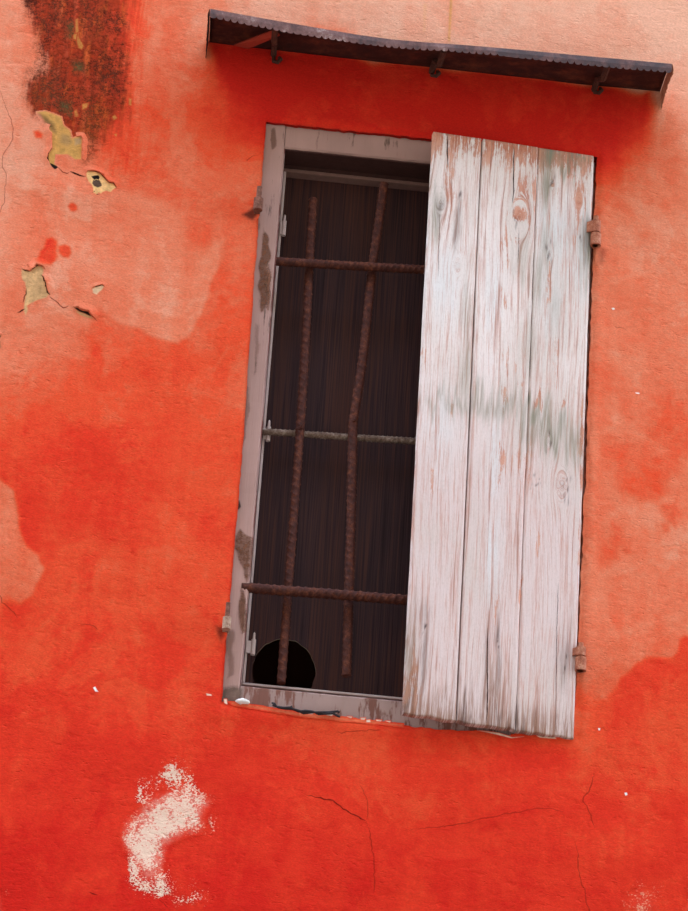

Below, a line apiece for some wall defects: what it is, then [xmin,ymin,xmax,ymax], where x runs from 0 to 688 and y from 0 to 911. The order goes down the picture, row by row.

spalling [36,104,121,195]
spalling [17,258,107,321]
crack [308,795,365,821]
water stain [358,632,688,911]